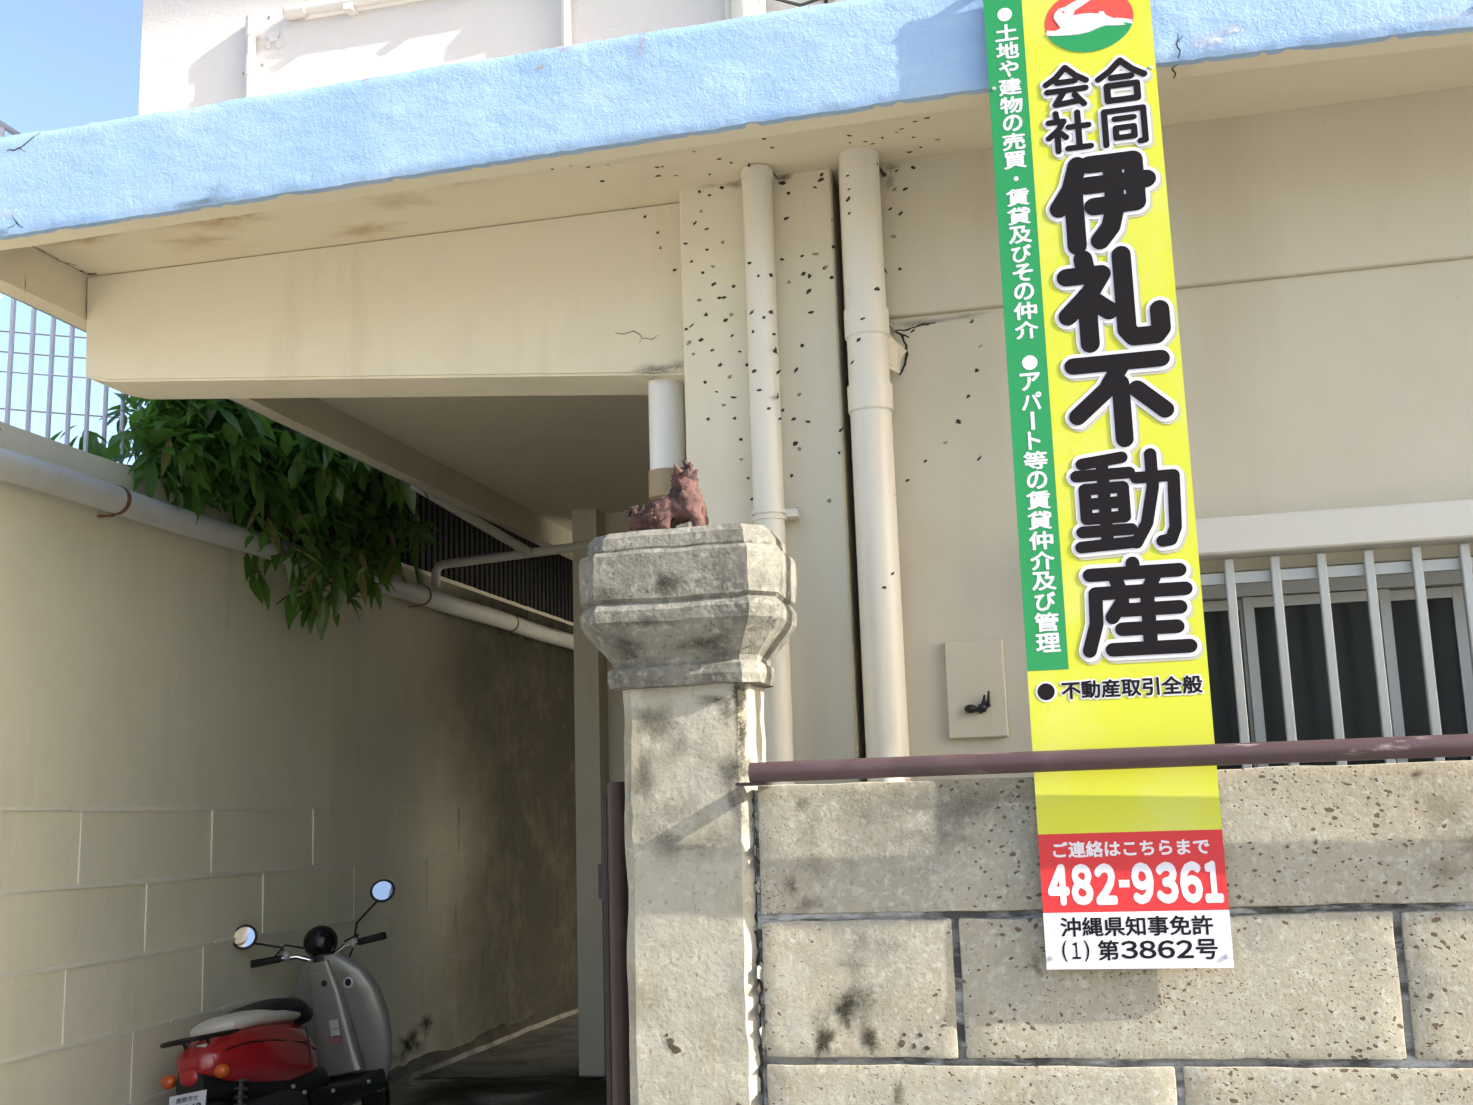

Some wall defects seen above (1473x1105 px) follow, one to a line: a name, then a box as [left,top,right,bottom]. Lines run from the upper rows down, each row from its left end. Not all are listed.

crack [615,330,659,343]
crack [889,322,936,375]
leakage [710,682,746,787]
leakage [817,995,877,1054]